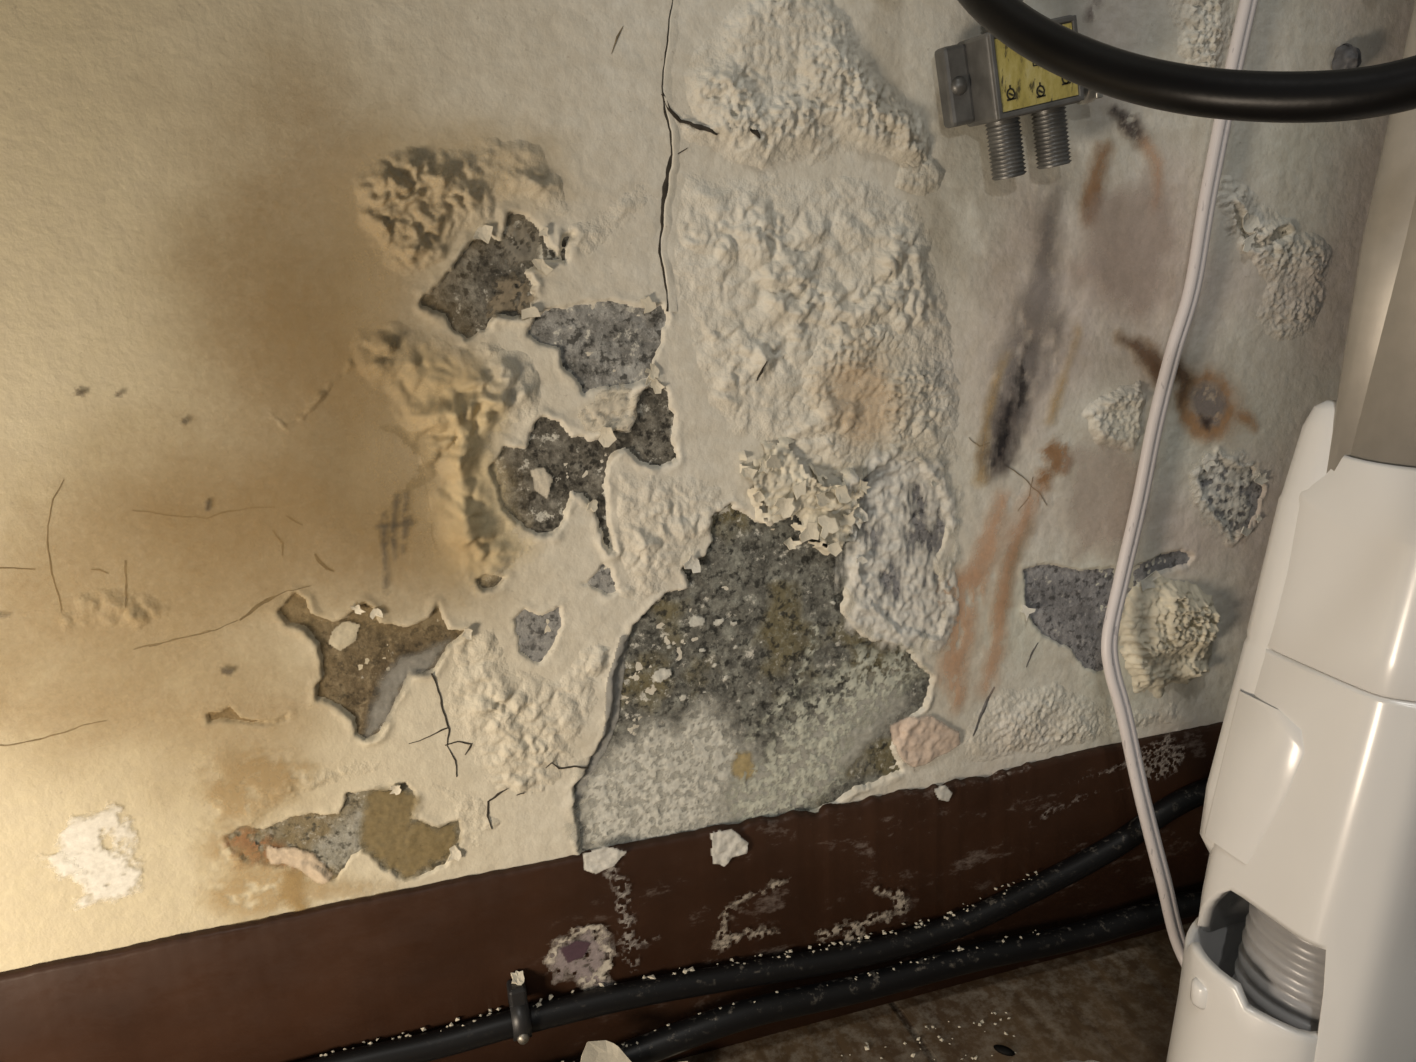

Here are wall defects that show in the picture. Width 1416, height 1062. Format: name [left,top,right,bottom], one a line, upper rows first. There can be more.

crack [658,0,761,312]
spalling [421,213,676,547]
rust [1116,335,1256,438]
leakage [389,349,518,578]
rust [1038,444,1071,484]
peeling [280,592,473,738]
spalling [572,437,961,851]
spalling [1020,550,1190,672]
spalling [224,783,462,911]